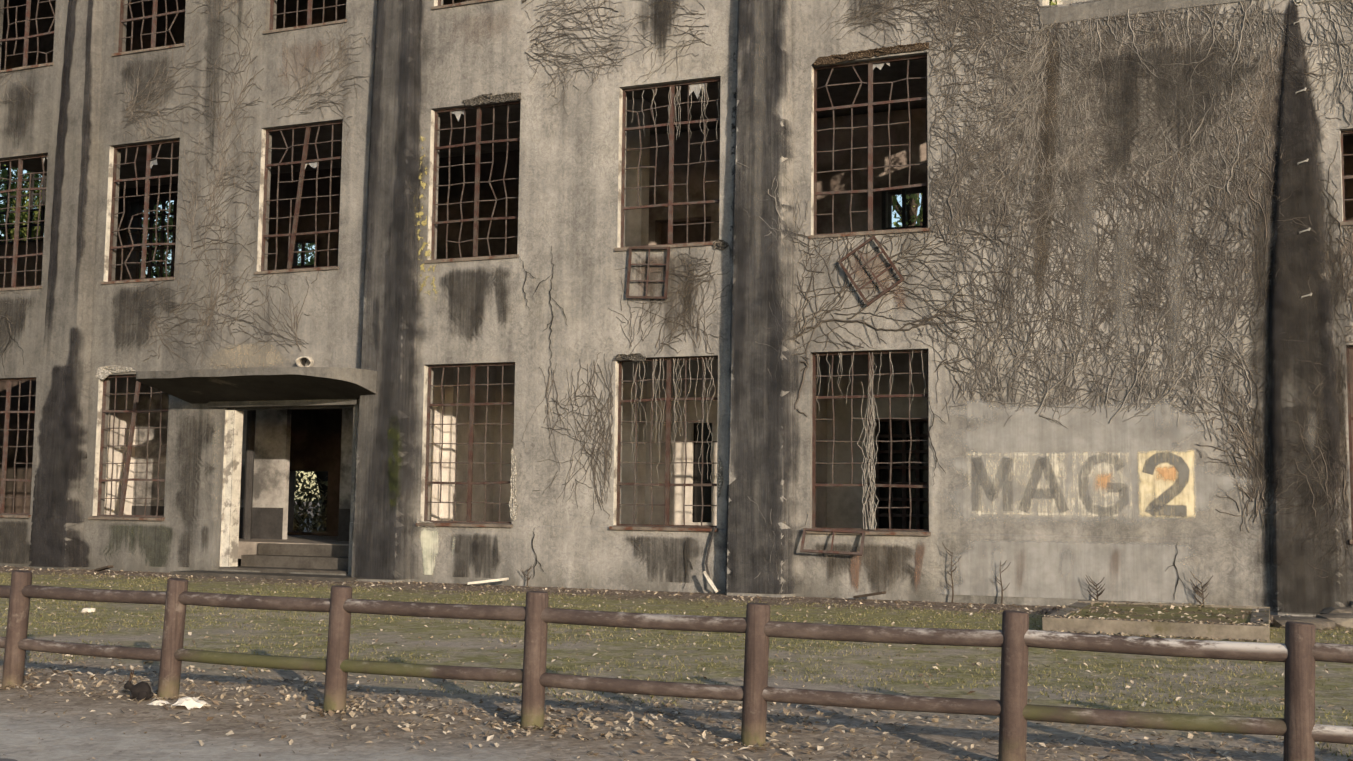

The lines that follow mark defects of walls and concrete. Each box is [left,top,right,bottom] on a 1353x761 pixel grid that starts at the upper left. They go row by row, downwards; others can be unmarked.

damp [642,0,679,54]
damp [355,0,438,580]
damp [442,268,507,340]
damp [724,0,800,594]
damp [1255,2,1350,614]
damp [453,534,499,578]
damp [627,537,698,583]